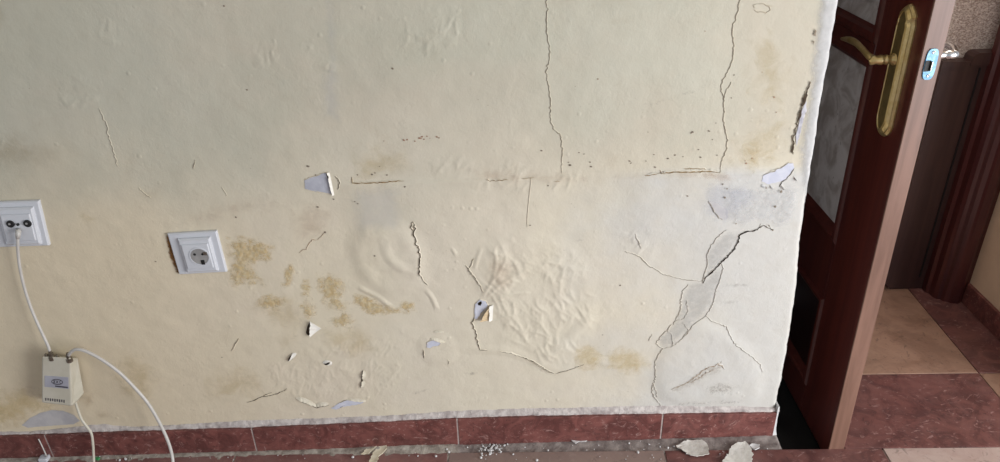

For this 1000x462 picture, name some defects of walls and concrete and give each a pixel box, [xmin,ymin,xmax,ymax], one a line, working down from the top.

crack [545,0,563,173]
crack [659,0,771,174]
peeling [761,82,811,193]
peeling [304,172,341,196]
crack [351,177,402,185]
crack [410,222,428,285]
peeling [306,321,321,337]
crack [470,318,488,351]
peeling [474,299,493,322]
crack [626,224,771,406]
crack [247,388,287,403]
peeling [296,371,366,410]